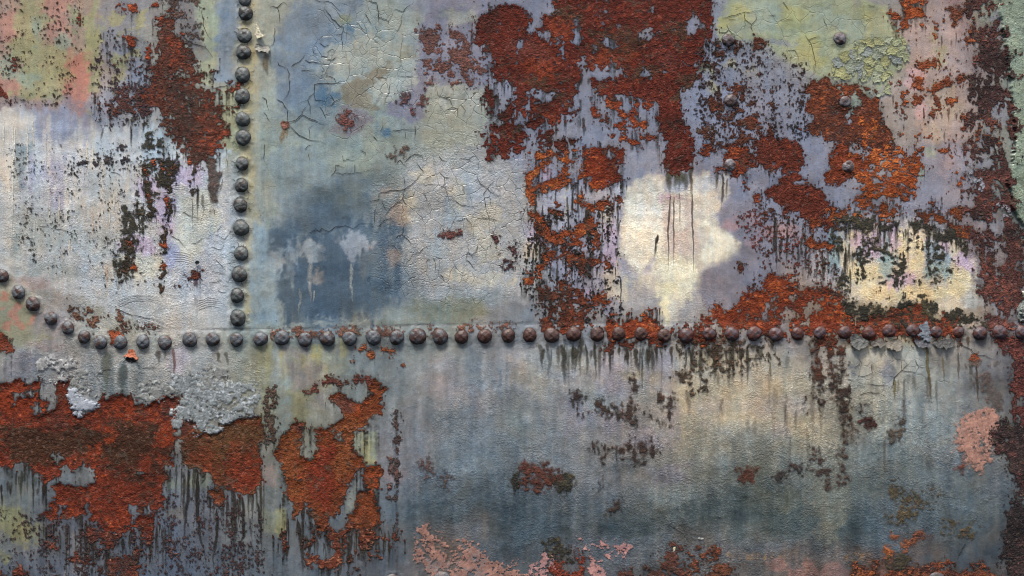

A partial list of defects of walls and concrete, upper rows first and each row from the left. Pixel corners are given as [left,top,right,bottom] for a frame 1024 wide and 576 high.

peeling [830,34,911,97]
corrosion [0,0,243,296]
corrosion [335,109,363,131]
crack [310,59,501,277]
corrosion [394,0,1024,576]
peeling [31,349,102,418]
peeling [134,363,261,437]
corrosion [0,320,406,576]
peeling [579,537,633,576]